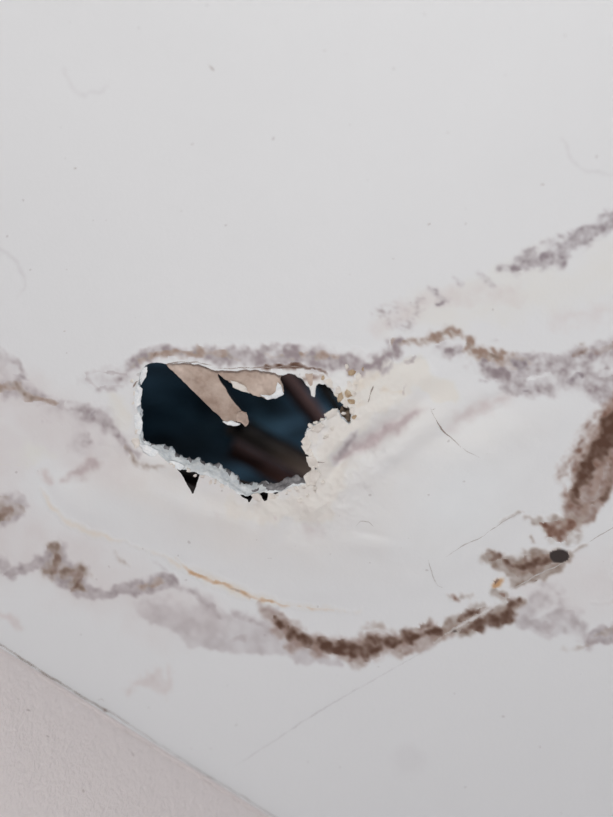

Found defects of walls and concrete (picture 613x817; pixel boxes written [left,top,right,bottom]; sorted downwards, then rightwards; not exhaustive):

spalling [130,351,465,548]
water stain [0,206,613,673]